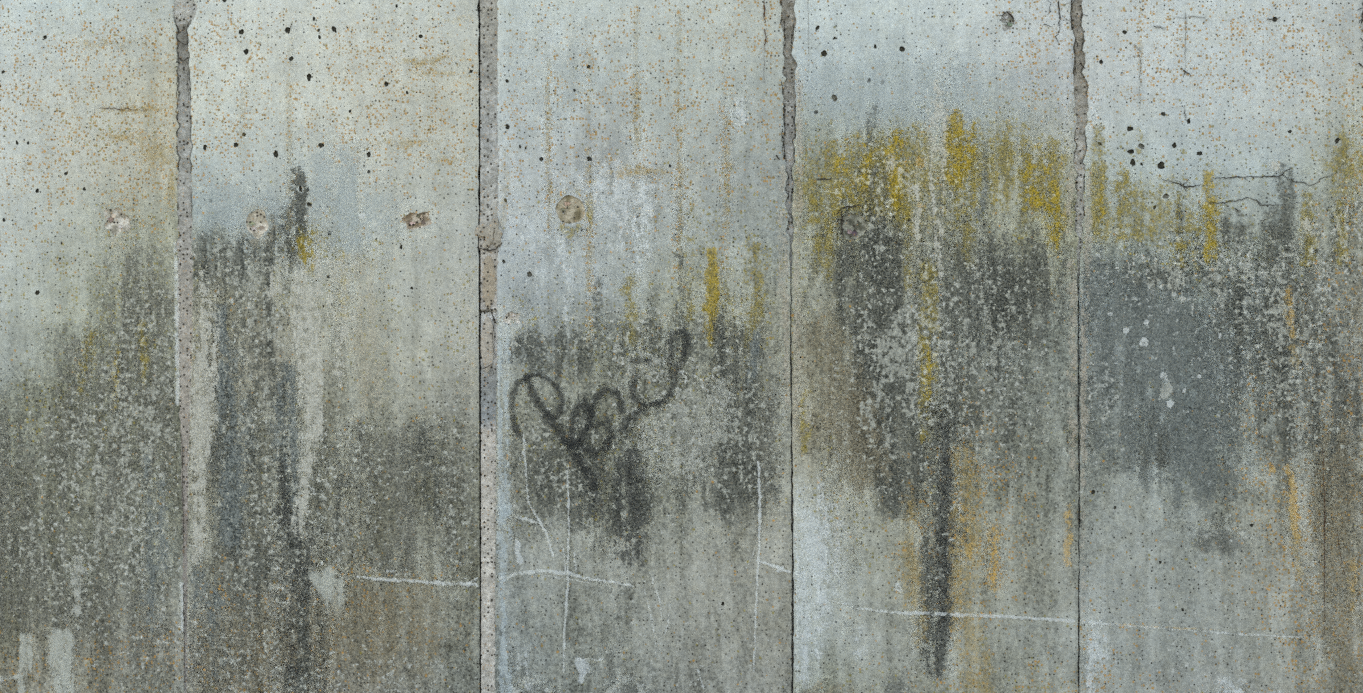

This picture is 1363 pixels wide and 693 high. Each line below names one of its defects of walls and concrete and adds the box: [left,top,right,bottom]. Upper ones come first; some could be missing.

spalling [103,207,131,235]
spalling [246,209,269,239]
spalling [402,212,432,230]
spalling [556,193,594,244]
crack [1161,168,1337,221]
damp [502,226,781,570]
damp [813,79,1363,679]
damp [0,166,473,693]